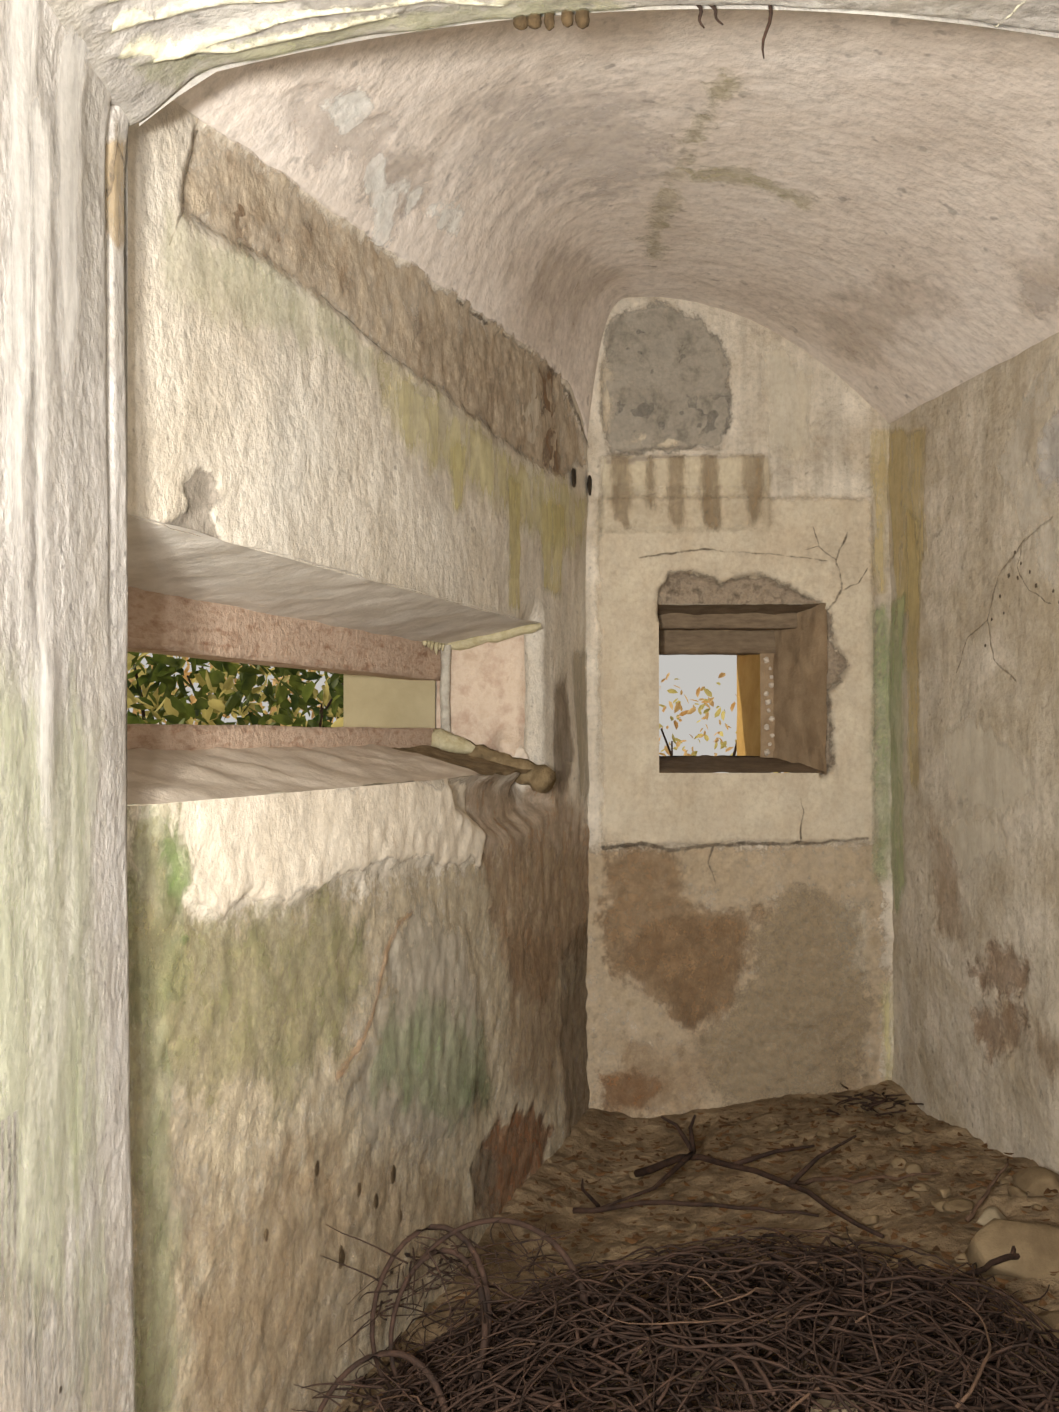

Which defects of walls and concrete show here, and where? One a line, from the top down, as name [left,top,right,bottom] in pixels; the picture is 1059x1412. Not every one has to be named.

leakage [374,354,585,608]
spalling [600,300,732,456]
peeling [597,496,876,846]
leakage [466,653,765,1138]